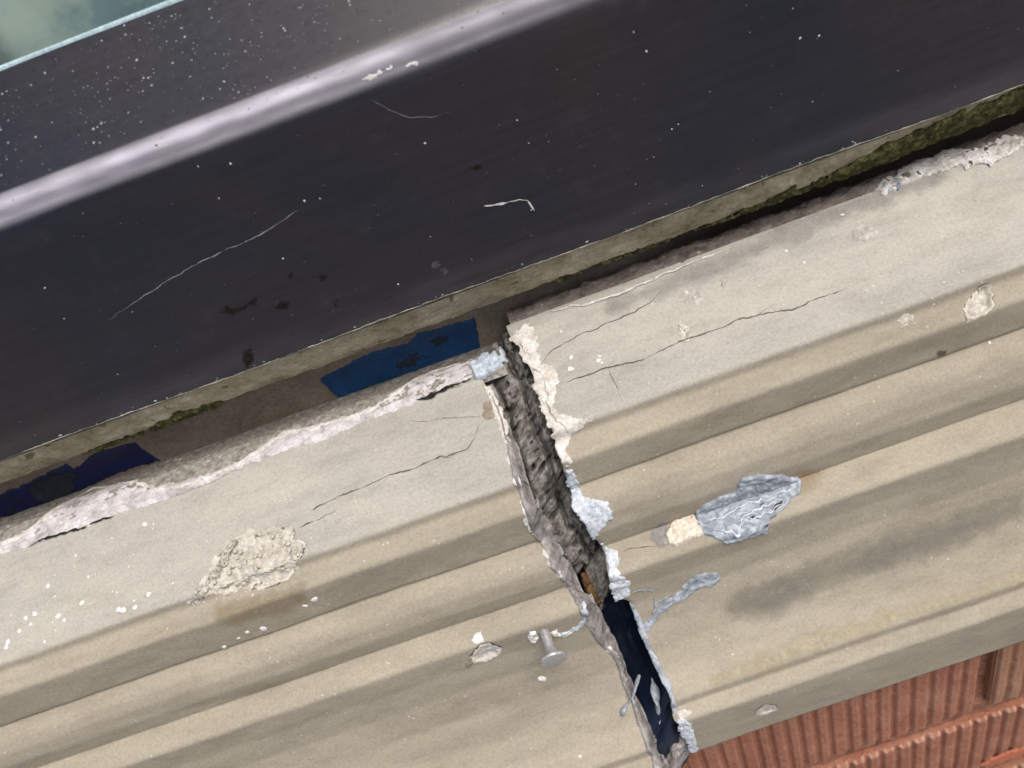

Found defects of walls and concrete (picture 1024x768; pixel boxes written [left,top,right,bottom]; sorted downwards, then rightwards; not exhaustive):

peeling [963,284,995,323]
crack [520,288,846,438]
crack [300,379,480,528]
spalling [187,526,306,609]
rust [580,572,602,605]